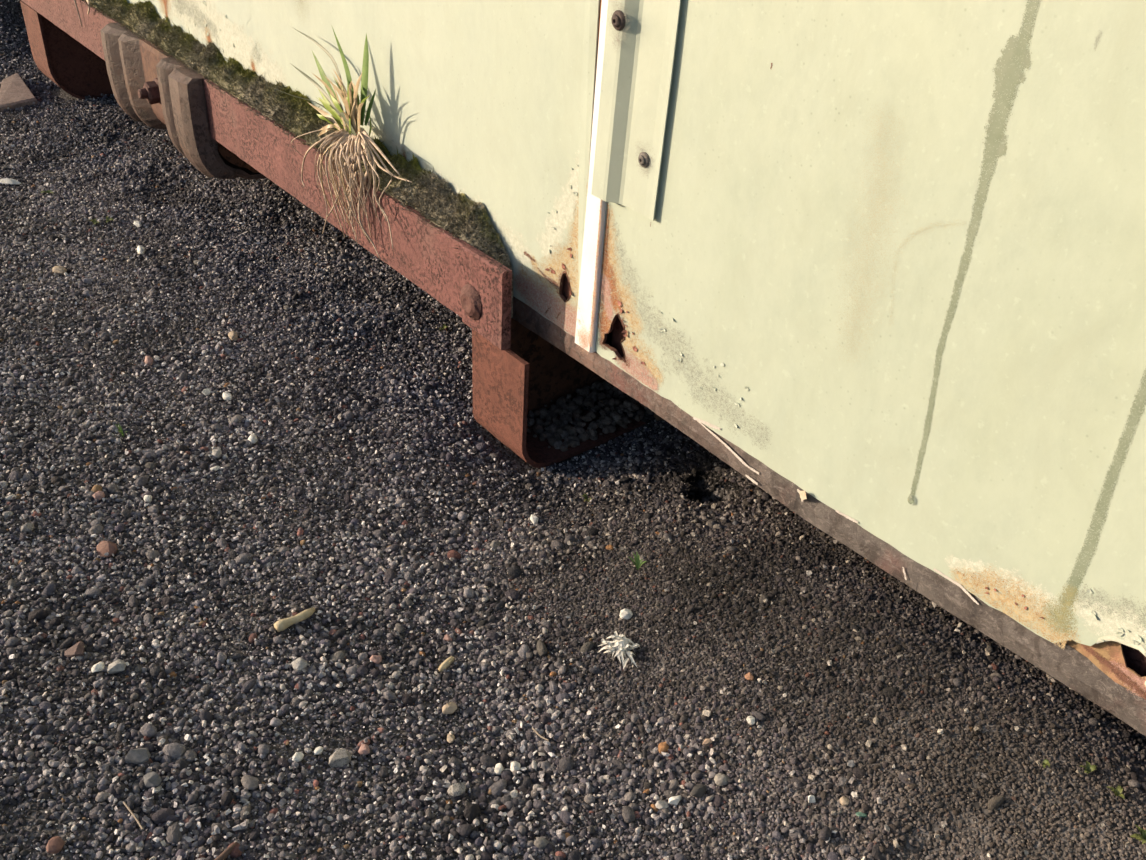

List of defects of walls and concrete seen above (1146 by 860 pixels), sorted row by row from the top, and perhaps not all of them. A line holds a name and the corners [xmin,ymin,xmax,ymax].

rust [514,182,665,392]
peeling [607,210,772,454]
damp [833,0,1042,504]
peeling [944,554,1146,656]
rust [949,566,1146,700]
damp [1041,370,1146,637]